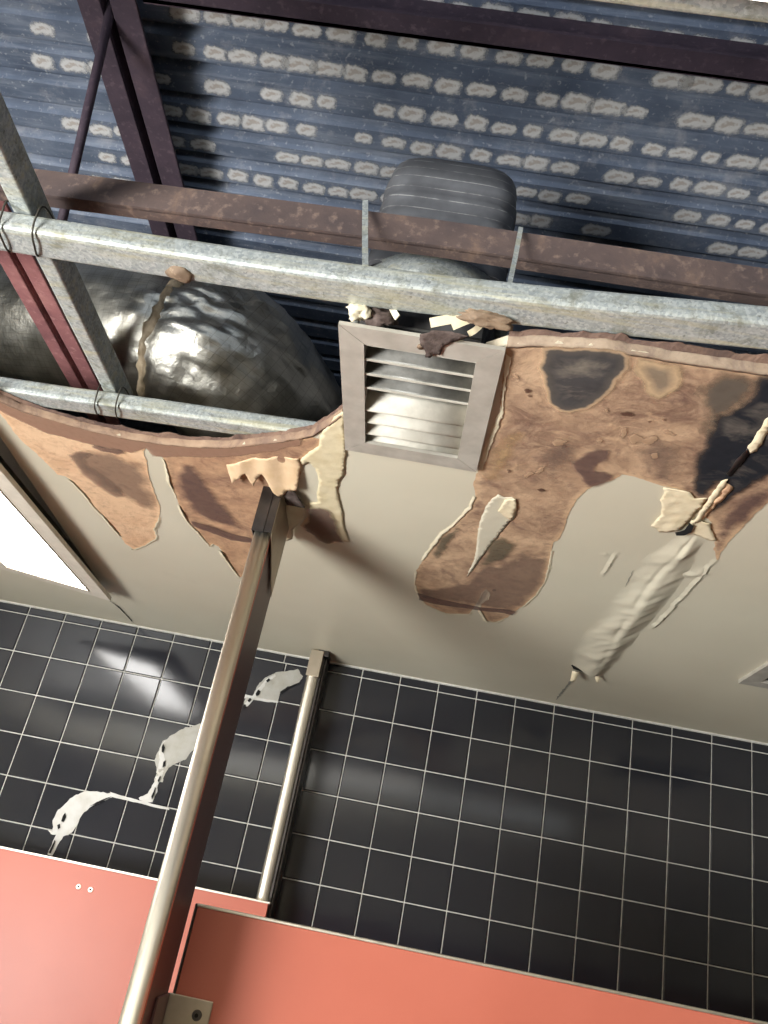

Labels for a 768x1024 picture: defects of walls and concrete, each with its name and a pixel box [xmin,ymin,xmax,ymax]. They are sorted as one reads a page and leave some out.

corrosion [61,117,120,137]
corrosion [164,104,318,137]
corrosion [179,163,384,202]
corrosion [275,151,396,178]
corrosion [354,132,580,175]
corrosion [604,169,768,204]
corrosion [673,209,768,234]
corrosion [707,242,768,259]
leakage [539,347,682,413]
peeling [0,390,343,578]
peeling [414,329,768,623]
leakage [694,377,768,536]